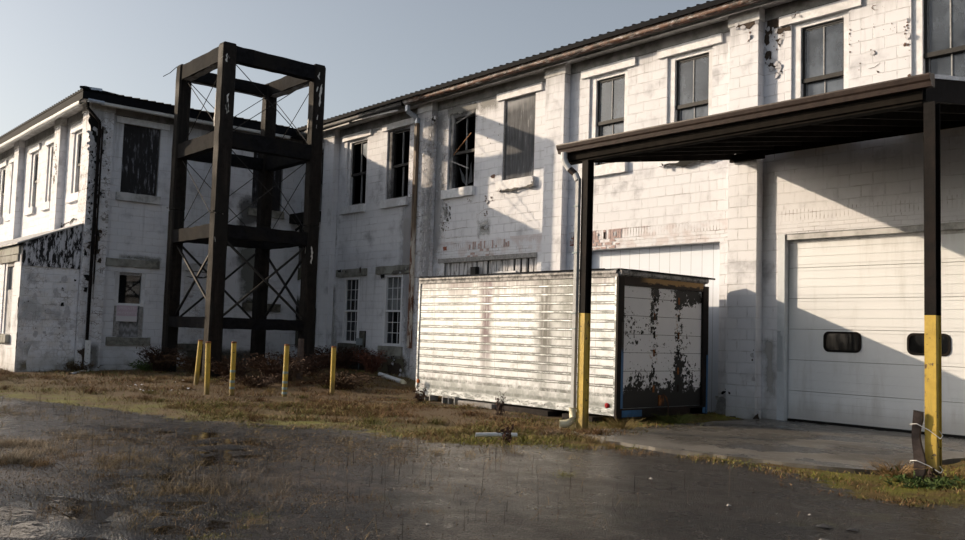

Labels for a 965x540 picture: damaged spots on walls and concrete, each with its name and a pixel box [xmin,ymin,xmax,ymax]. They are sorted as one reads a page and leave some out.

peeling [735,10,802,78]
peeling [61,112,111,263]
peeling [592,229,621,250]